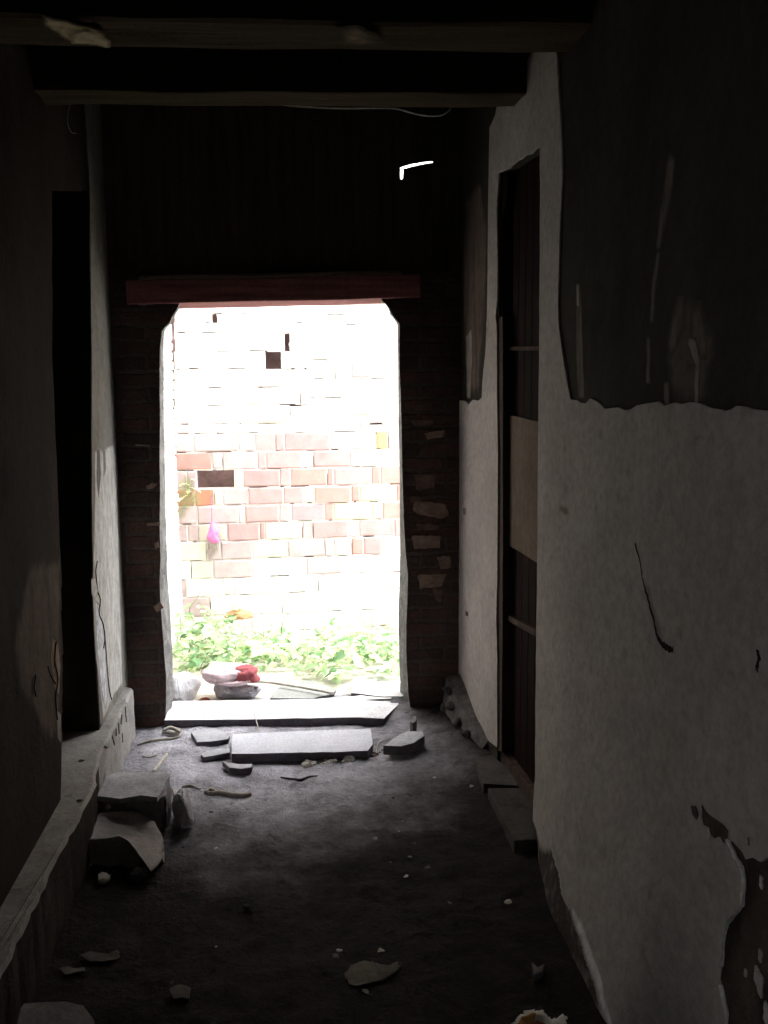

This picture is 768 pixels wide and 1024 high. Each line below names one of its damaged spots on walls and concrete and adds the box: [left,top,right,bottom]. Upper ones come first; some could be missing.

spalling [410,474,451,603]
crack [635,543,676,659]
spalling [691,804,768,1024]